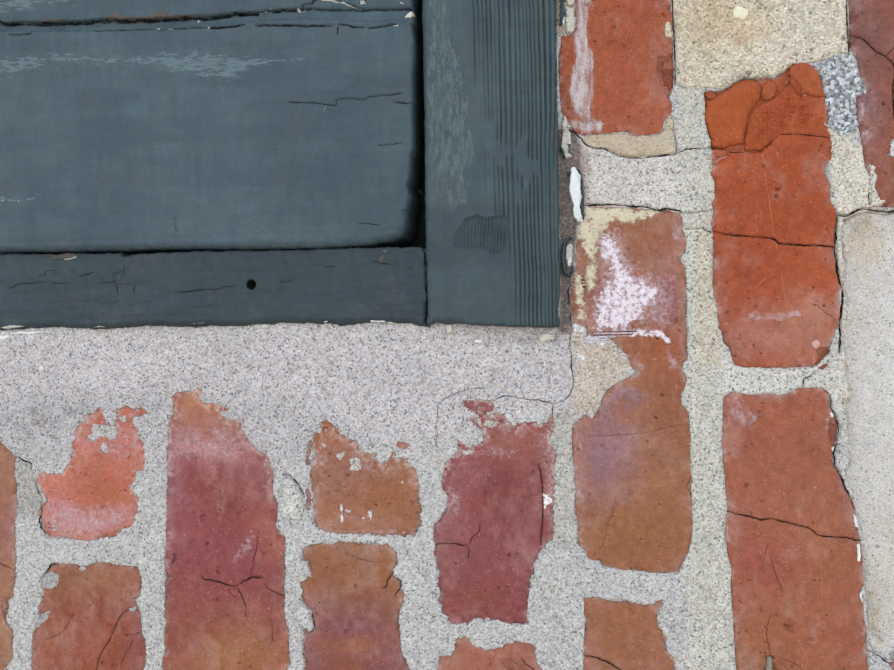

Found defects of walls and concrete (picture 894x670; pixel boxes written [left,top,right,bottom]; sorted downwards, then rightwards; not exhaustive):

crack [0,0,397,36]
peeling [425,0,475,211]
peeling [559,0,577,35]
peeling [566,169,585,220]
crack [569,130,739,159]
spalling [704,63,825,165]
crack [846,5,894,117]
peeling [565,243,573,267]
water stain [585,227,670,344]
crack [585,180,894,353]
crack [435,284,574,447]
spalling [815,350,831,370]